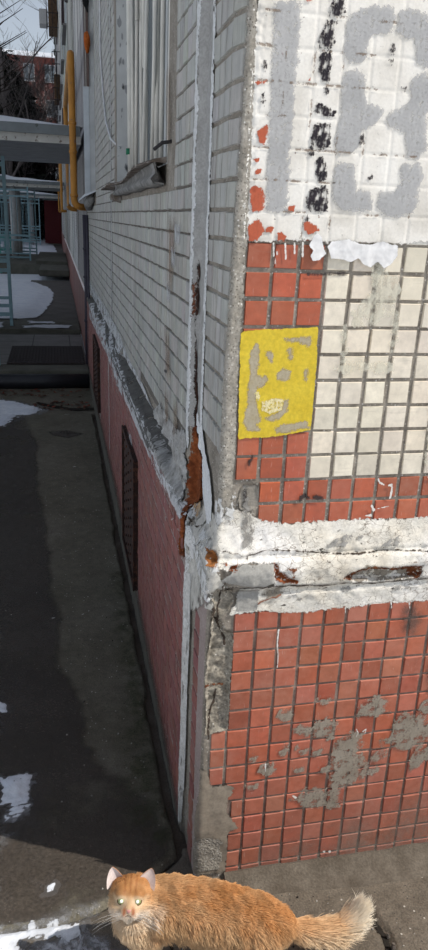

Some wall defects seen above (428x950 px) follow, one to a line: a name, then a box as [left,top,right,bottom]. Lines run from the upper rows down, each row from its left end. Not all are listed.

peeling [304,221,319,235]
spalling [178,0,298,736]
crack [188,517,428,645]
spalling [341,565,425,592]
crack [207,689,217,740]